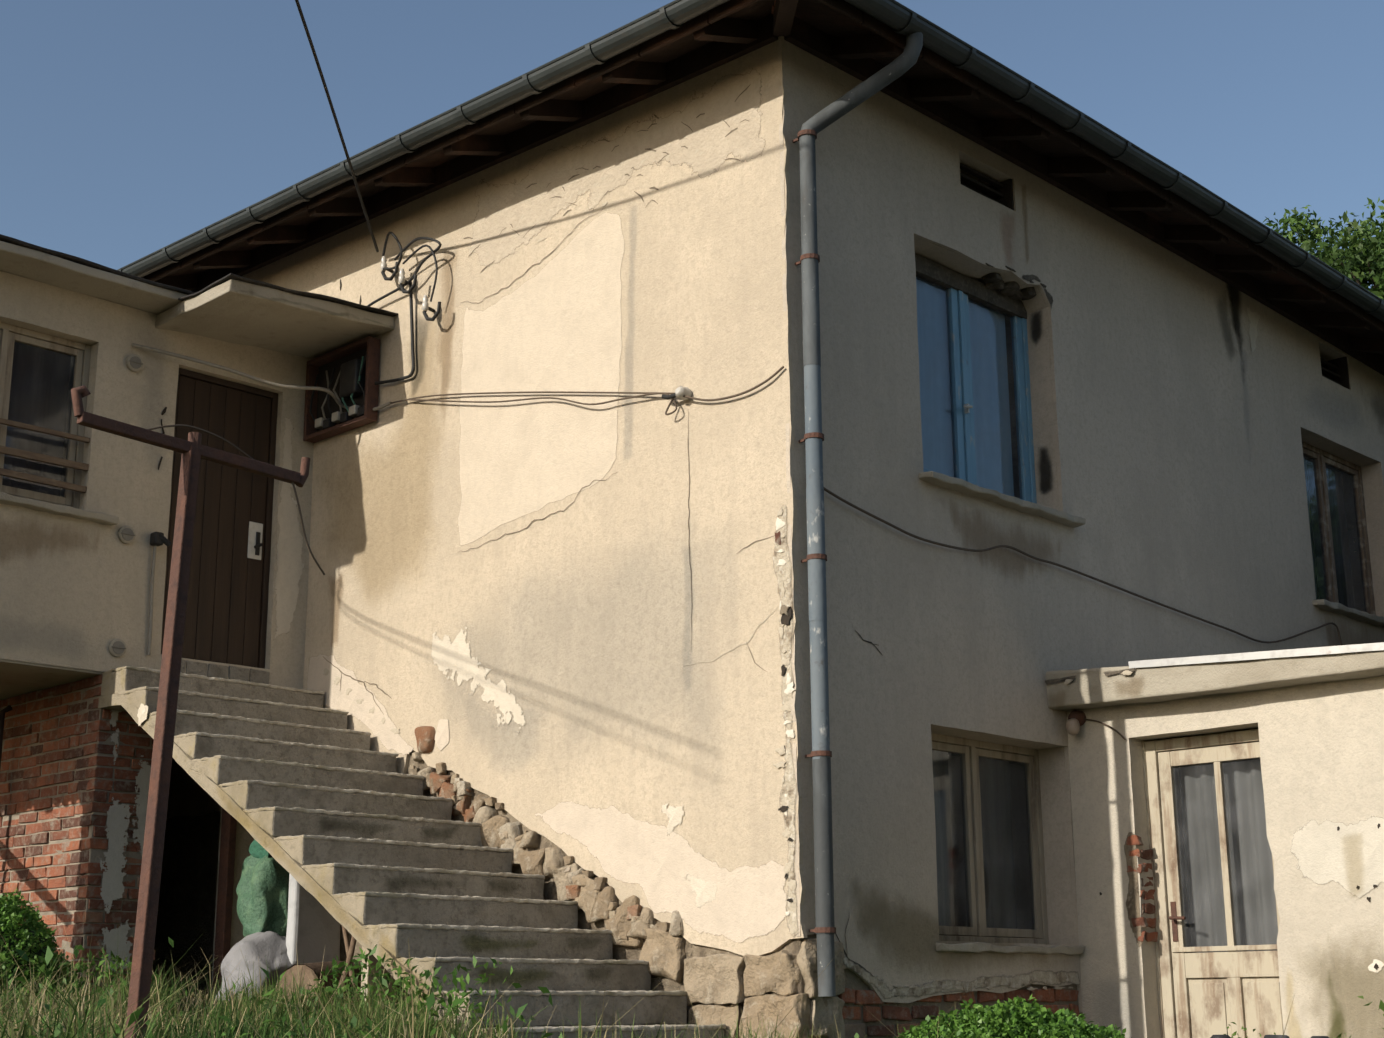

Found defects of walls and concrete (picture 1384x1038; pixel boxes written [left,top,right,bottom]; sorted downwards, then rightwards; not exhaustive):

damp [1228,284,1260,356]
crack [459,472,617,552]
peeling [110,703,148,765]
peeling [431,627,531,732]
peeling [535,505,798,943]
peeling [99,755,151,977]
flaking render [1124,832,1158,947]
flaking render [843,957,1080,999]